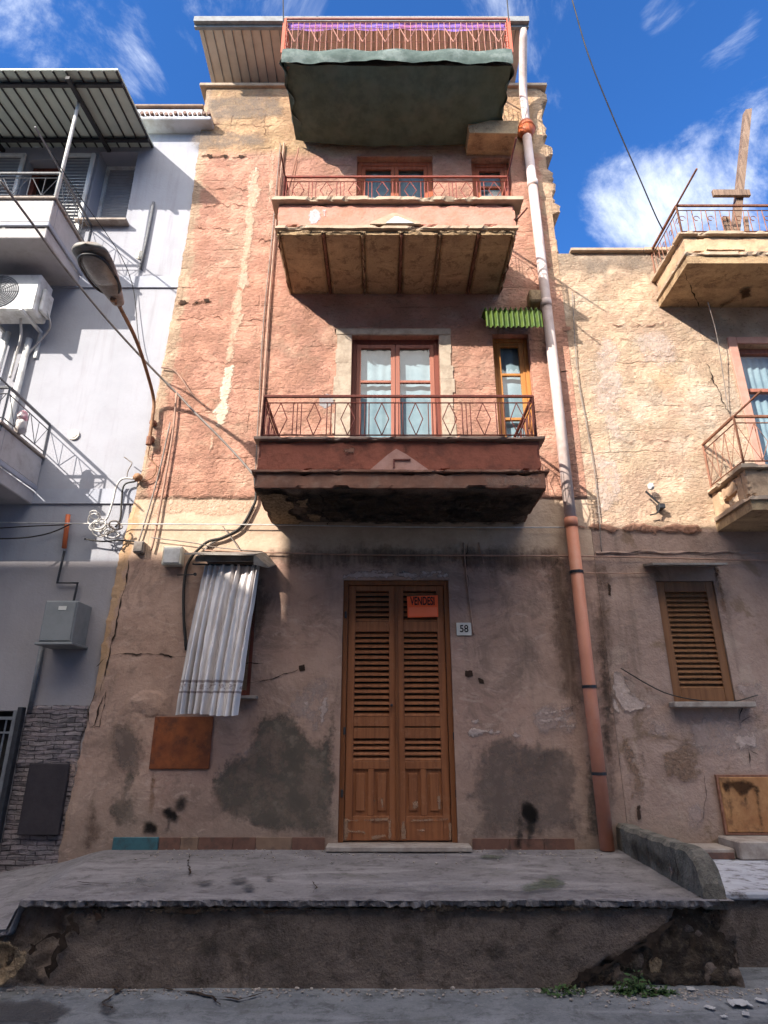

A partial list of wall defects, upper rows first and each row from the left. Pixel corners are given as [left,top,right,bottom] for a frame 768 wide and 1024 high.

peeling [279,209,366,234]
peeling [210,154,275,448]
crack [88,562,183,728]
peeling [613,672,650,713]
leakage [110,726,141,825]
leakage [213,714,335,836]
leakage [467,738,576,847]
crack [35,908,80,979]
spalling [394,904,595,913]
spalling [584,896,740,987]
crack [102,986,262,1008]